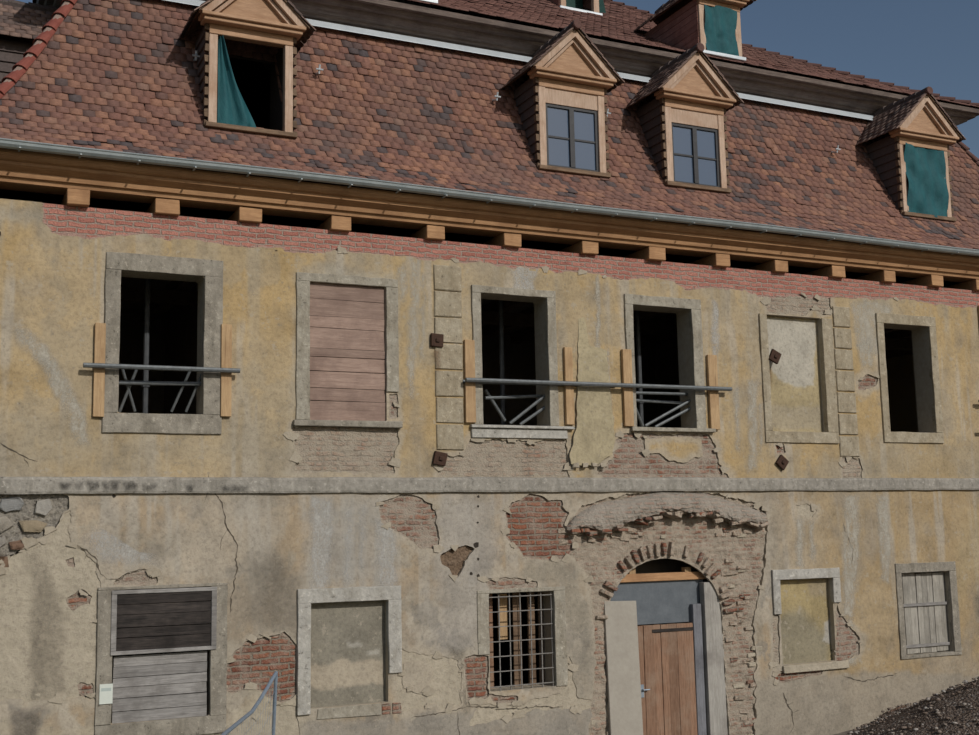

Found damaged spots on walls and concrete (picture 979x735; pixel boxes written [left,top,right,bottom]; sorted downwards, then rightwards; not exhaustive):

flaking render [433,437,575,477]
flaking render [597,431,730,478]
flaking render [0,494,101,704]
flaking render [114,568,162,586]
crack [206,473,243,612]
flaking render [376,494,473,582]
flaking render [462,491,822,735]
flaking render [832,610,862,661]
flaking render [214,632,300,735]